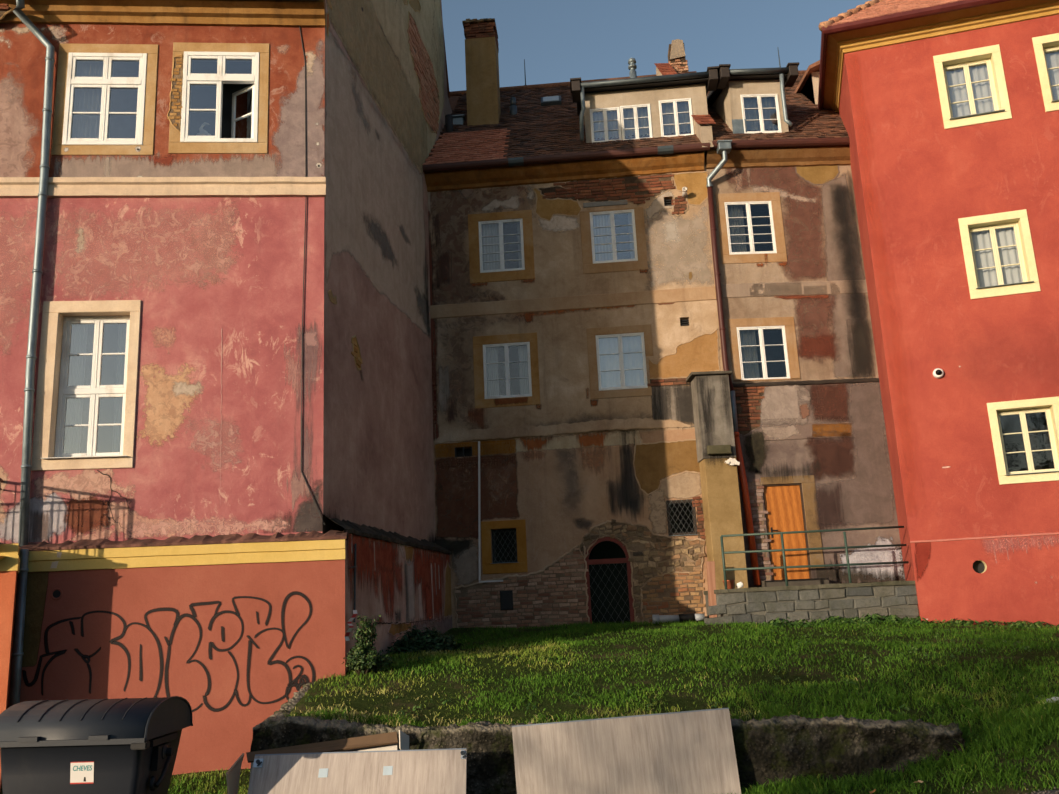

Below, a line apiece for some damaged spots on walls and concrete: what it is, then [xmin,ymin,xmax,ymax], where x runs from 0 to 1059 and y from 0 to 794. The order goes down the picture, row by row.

peeling [0,26,65,48]
flaking render [403,0,440,134]
water stain [364,217,394,263]
flaking render [482,171,708,241]
spalling [647,329,721,387]
peeling [136,363,241,471]
peeling [0,467,8,523]
peeling [34,468,288,541]
flaking render [453,434,706,628]
water stain [516,418,644,515]